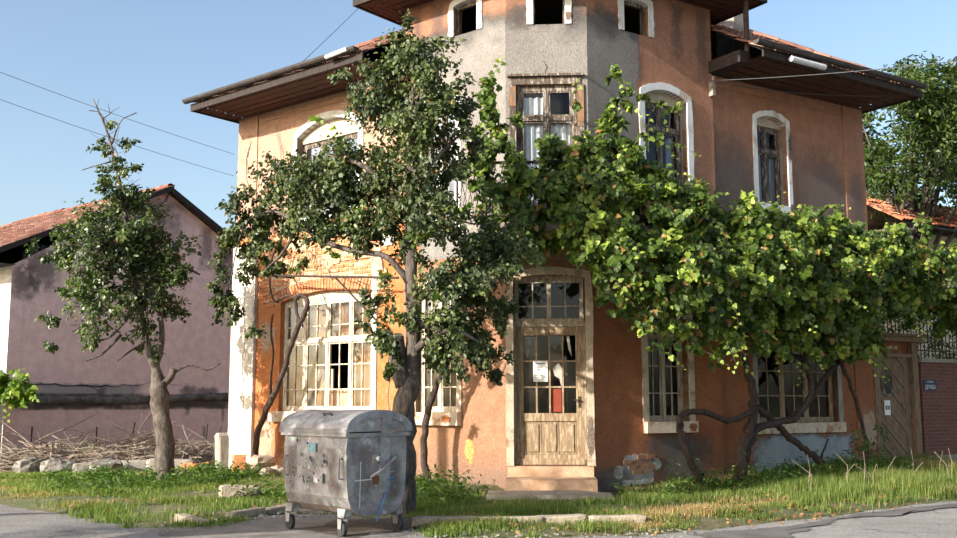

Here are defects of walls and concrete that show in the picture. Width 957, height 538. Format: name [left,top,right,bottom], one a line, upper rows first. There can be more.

spalling [259,219,394,307]
spalling [614,454,662,486]